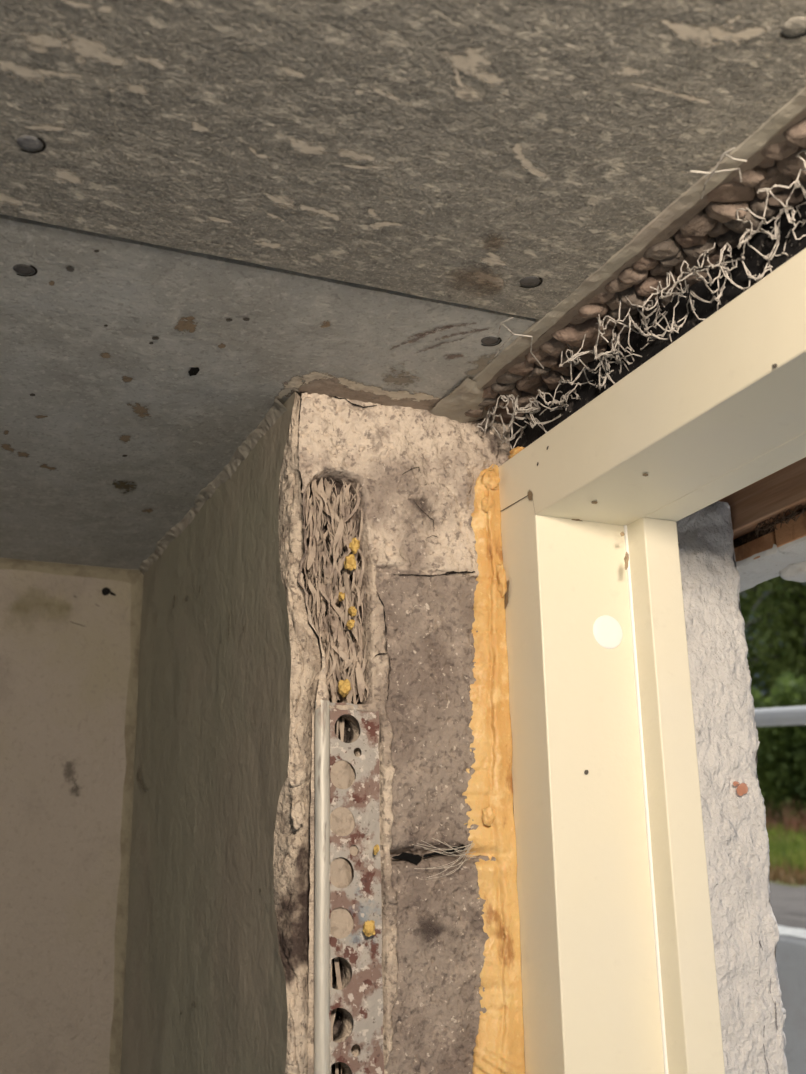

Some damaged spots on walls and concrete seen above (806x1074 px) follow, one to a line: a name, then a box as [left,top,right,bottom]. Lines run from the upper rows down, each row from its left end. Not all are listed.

spalling [273,392,322,1074]